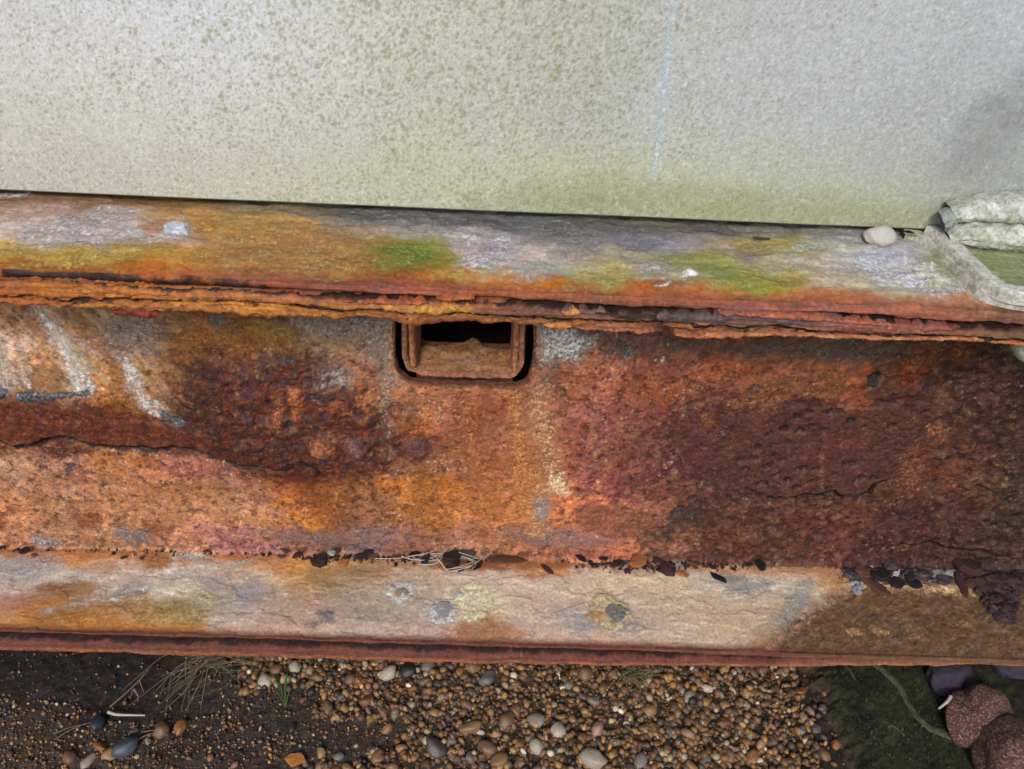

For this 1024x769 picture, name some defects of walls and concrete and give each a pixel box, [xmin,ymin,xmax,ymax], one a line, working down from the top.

corrosion [191,207,770,282]
efflorescence [840,245,966,295]
corrosion [329,285,476,316]
corrosion [0,219,323,470]
corrosion [499,299,1024,388]
corrosion [726,358,871,416]
crack [1,435,319,478]
corrosion [36,581,228,628]
corrosion [0,545,301,572]
corrosion [305,546,630,587]
corrosion [653,557,987,627]
peeling [765,564,1024,657]